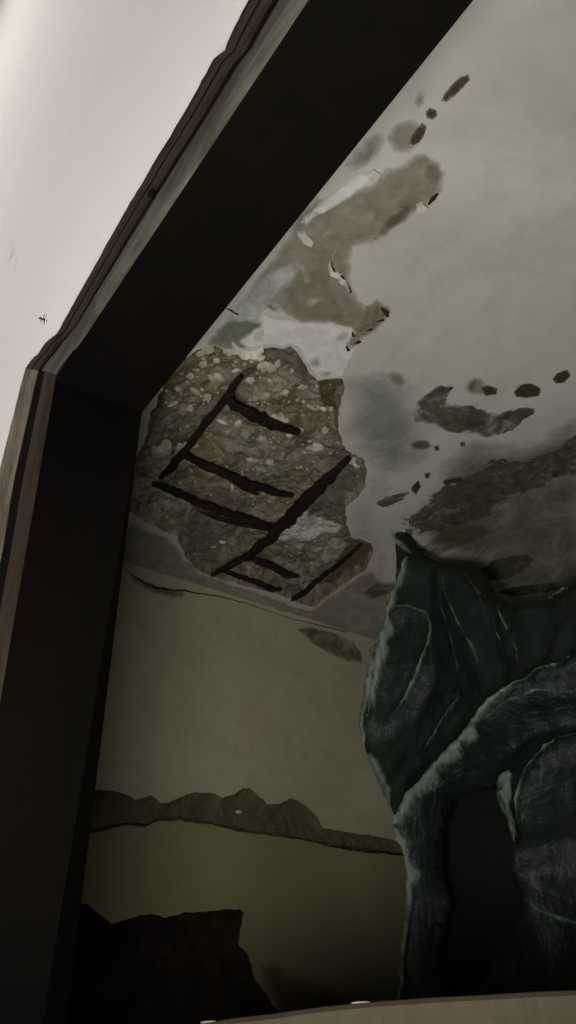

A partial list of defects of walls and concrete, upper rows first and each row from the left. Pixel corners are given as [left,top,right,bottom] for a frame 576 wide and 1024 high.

peeling [392,125,418,149]
leakage [301,174,373,223]
peeling [251,157,439,352]
leakage [212,264,359,380]
leakage [417,386,534,446]
spalling [130,329,374,607]
leakage [377,472,431,507]
leakage [402,435,576,596]
peeling [300,628,361,662]
flaking render [90,788,404,856]